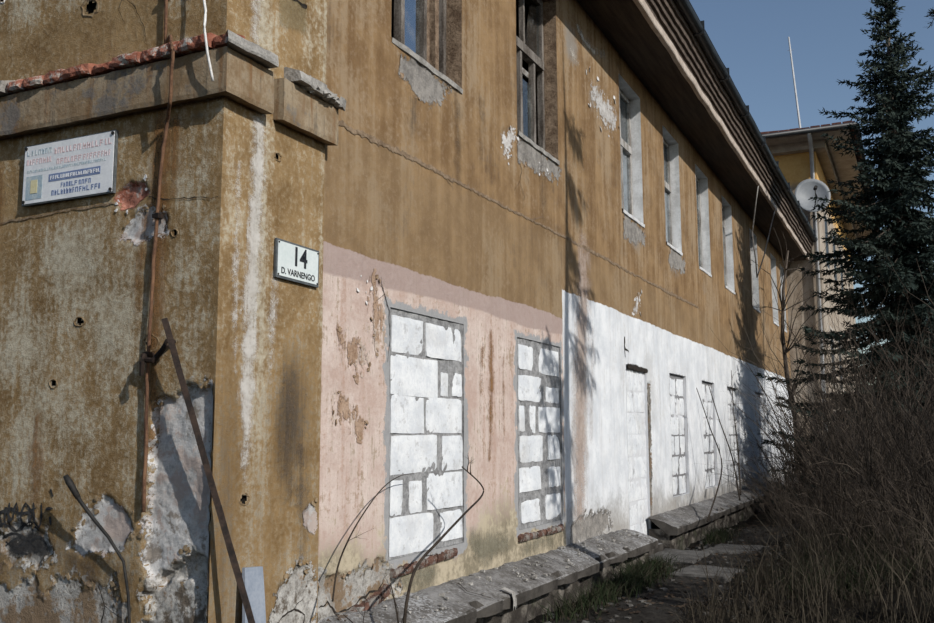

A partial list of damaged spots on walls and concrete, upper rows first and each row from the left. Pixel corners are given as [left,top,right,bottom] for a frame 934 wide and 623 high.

flaking render [398,54,453,109]
peeling [586,68,617,138]
flaking render [501,125,562,186]
flaking render [114,174,179,246]
crack [149,196,218,223]
crack [338,120,699,308]
leakage [235,118,263,440]
peeling [331,389,369,444]
rust [480,330,504,460]
flaking render [0,373,213,623]
flaking render [269,548,458,623]